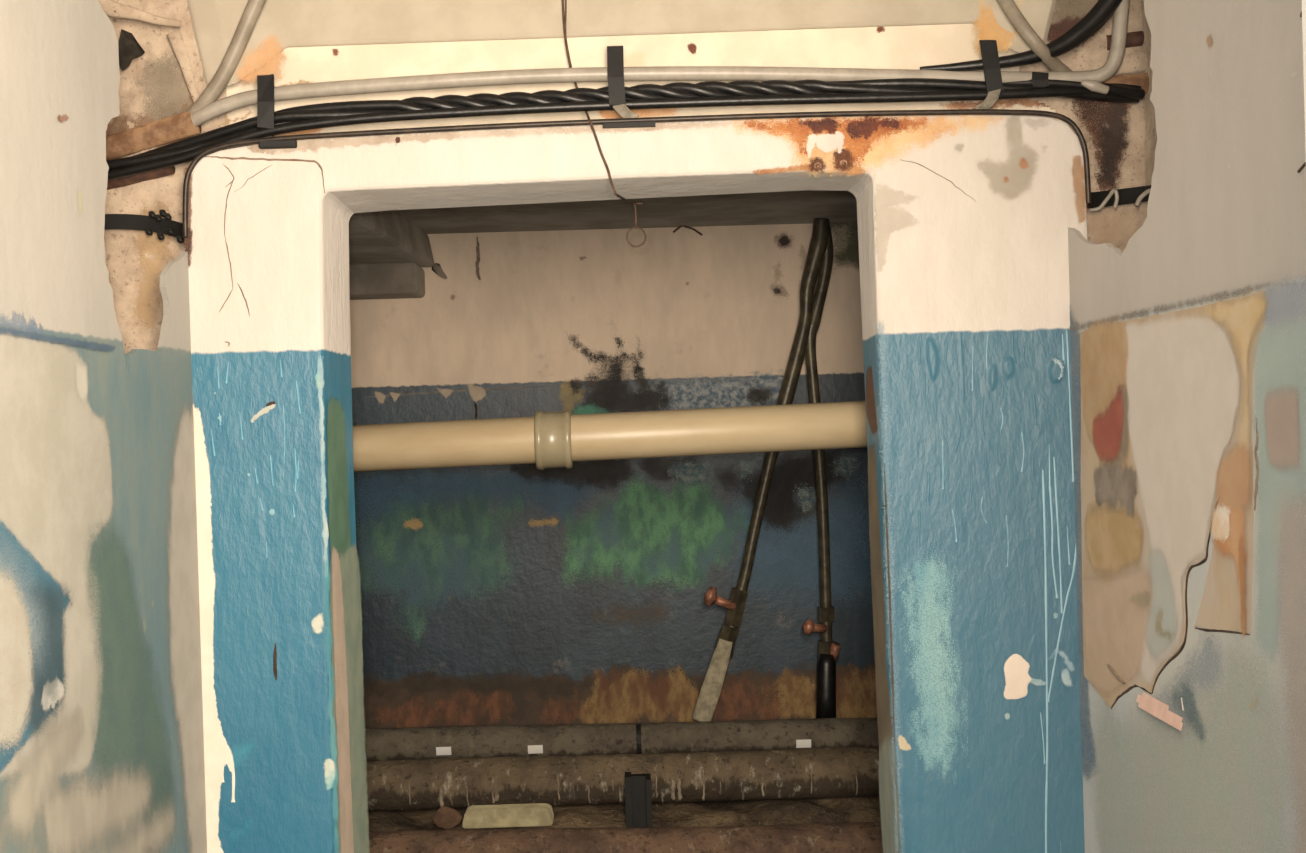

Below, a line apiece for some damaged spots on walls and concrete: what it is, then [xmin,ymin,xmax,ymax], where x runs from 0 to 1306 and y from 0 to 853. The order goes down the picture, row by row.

spalling [104,155,207,354]
spalling [106,0,252,158]
crack [205,156,325,317]
corrosion [729,98,1048,178]
spalling [1019,0,1143,76]
spalling [1031,97,1148,253]
peeling [1079,288,1271,742]